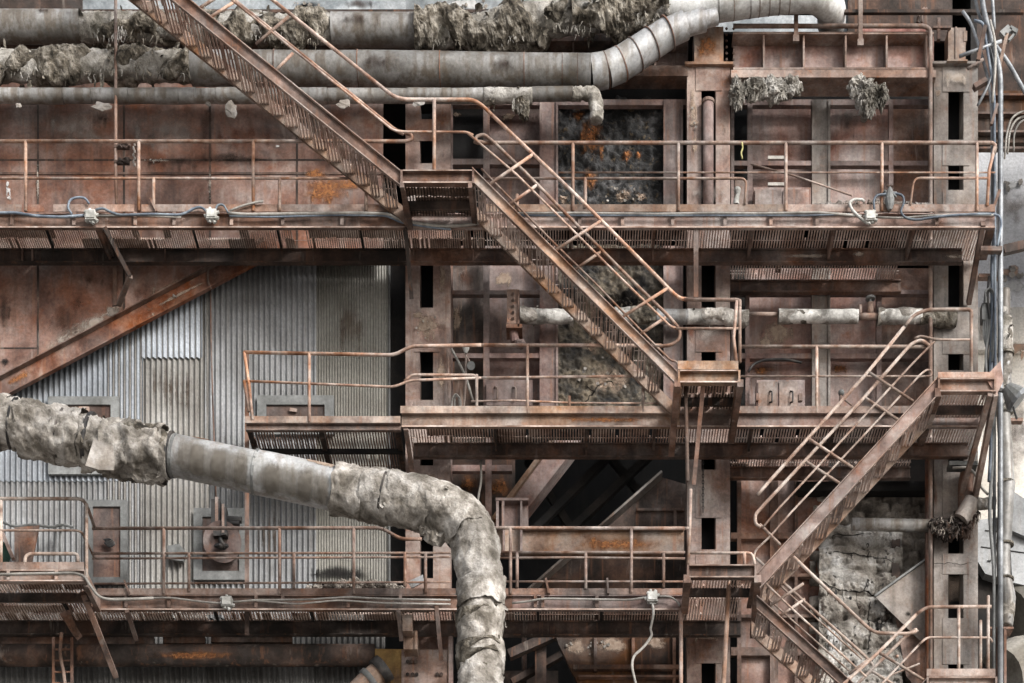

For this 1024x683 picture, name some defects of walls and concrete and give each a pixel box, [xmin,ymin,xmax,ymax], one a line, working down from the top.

corrosion [308,169,356,204]
crack [823,533,890,649]